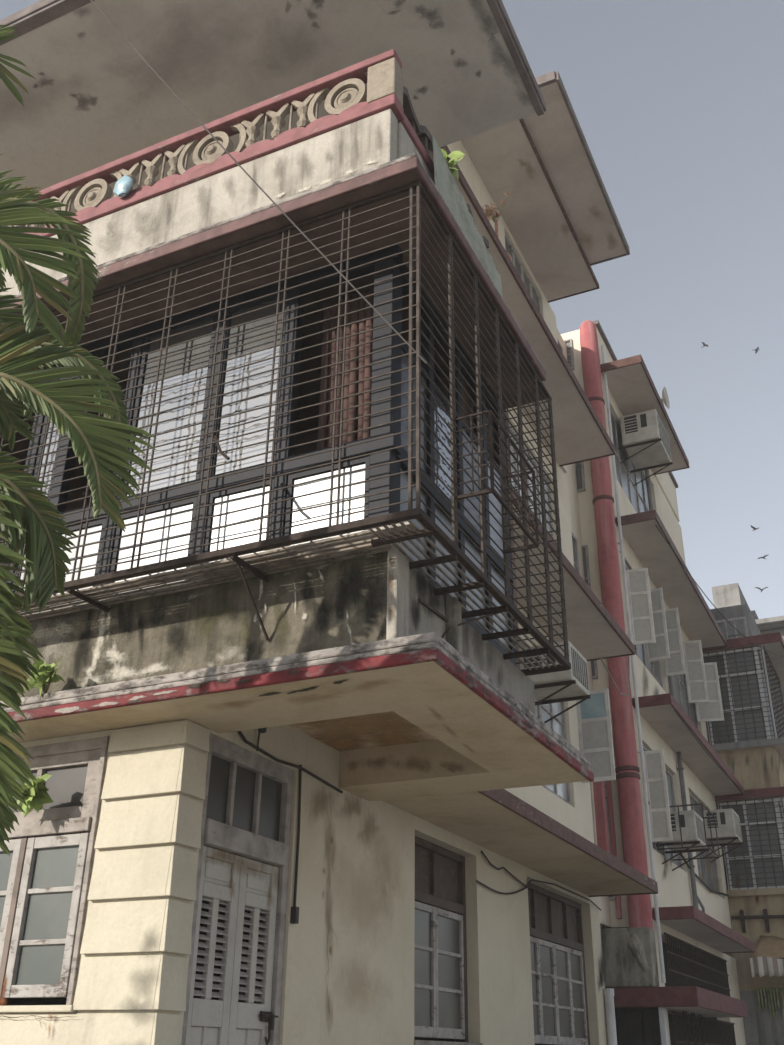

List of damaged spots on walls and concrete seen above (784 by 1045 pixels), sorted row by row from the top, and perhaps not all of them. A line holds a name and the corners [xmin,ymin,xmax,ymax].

leakage [294,567,377,645]
leakage [413,572,448,628]
leakage [74,603,166,687]
spalling [209,649,245,667]
peeling [93,678,252,707]
peeling [260,686,318,696]